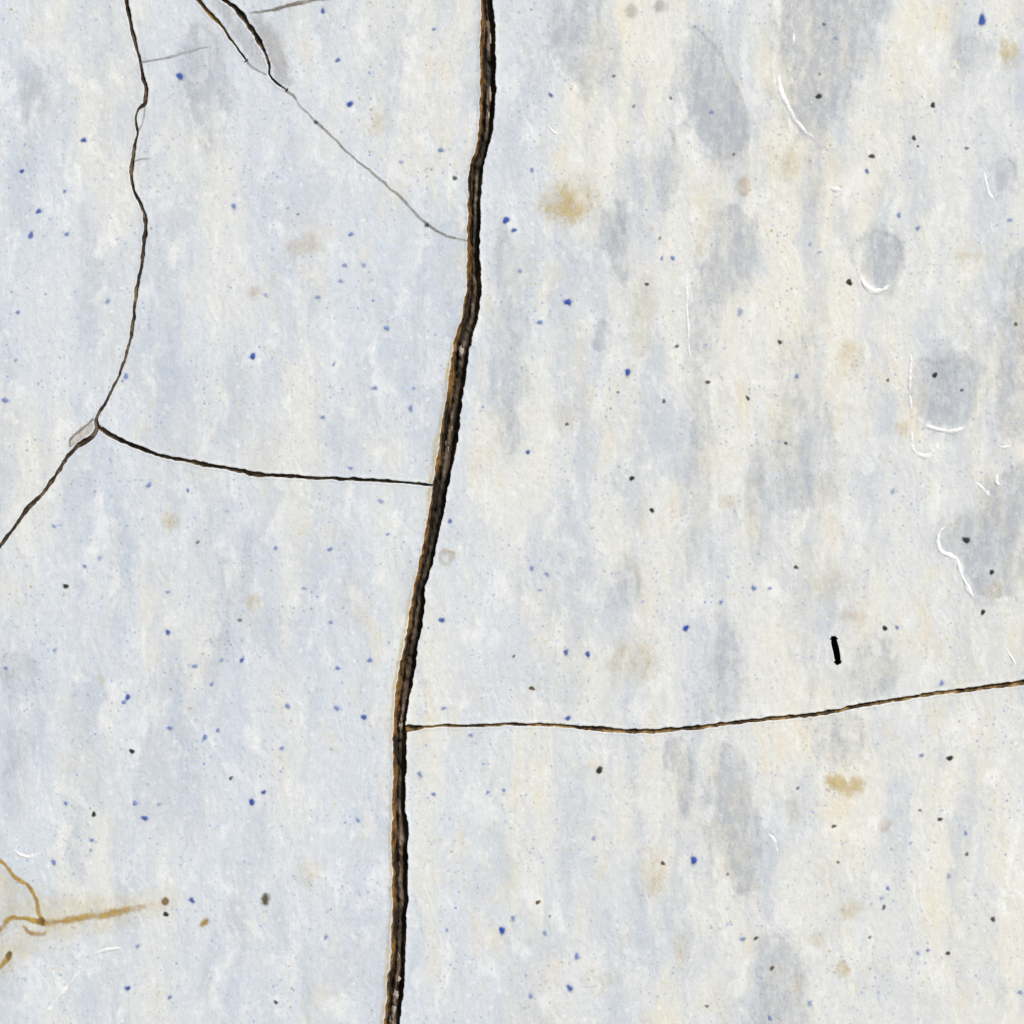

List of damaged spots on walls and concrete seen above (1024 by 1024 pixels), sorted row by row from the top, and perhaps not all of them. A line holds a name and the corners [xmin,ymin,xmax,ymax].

crack [0,0,433,554]
crack [381,0,1024,1024]
corrosion [0,859,129,935]